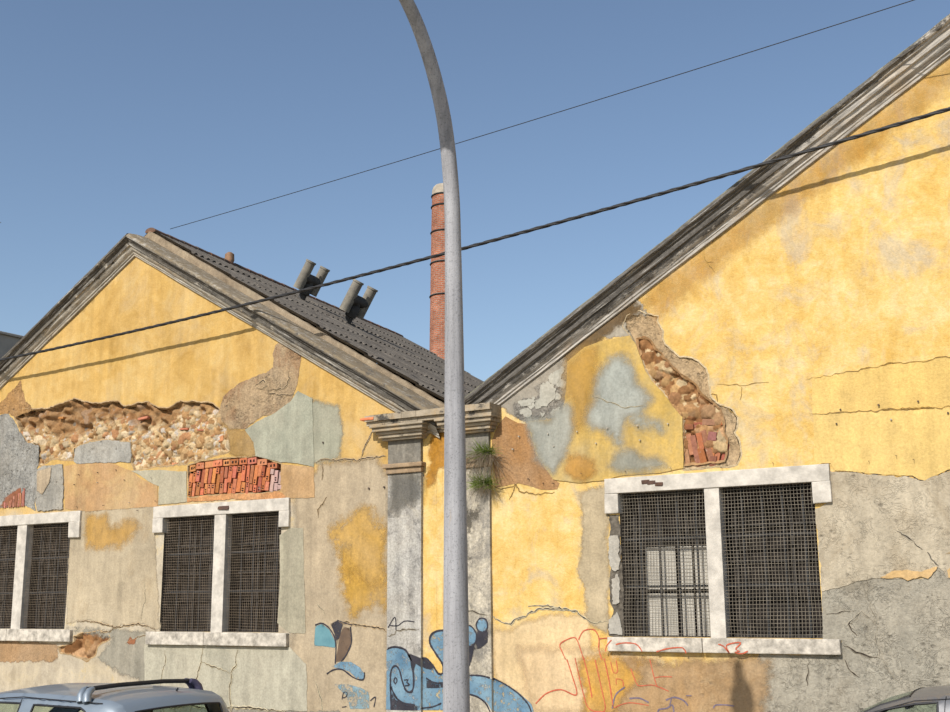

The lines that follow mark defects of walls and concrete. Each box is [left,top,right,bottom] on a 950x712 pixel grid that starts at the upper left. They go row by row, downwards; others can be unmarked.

crack [811,356,950,378]
peeling [513,366,567,421]
flaking render [622,310,742,471]
crack [810,405,949,415]
flaking render [0,343,301,502]
leakage [388,432,444,513]
crack [833,469,950,481]
flaking render [1,488,25,508]
leakage [467,509,479,533]
leakage [329,506,387,618]
peeling [881,567,950,581]
crack [468,604,608,625]